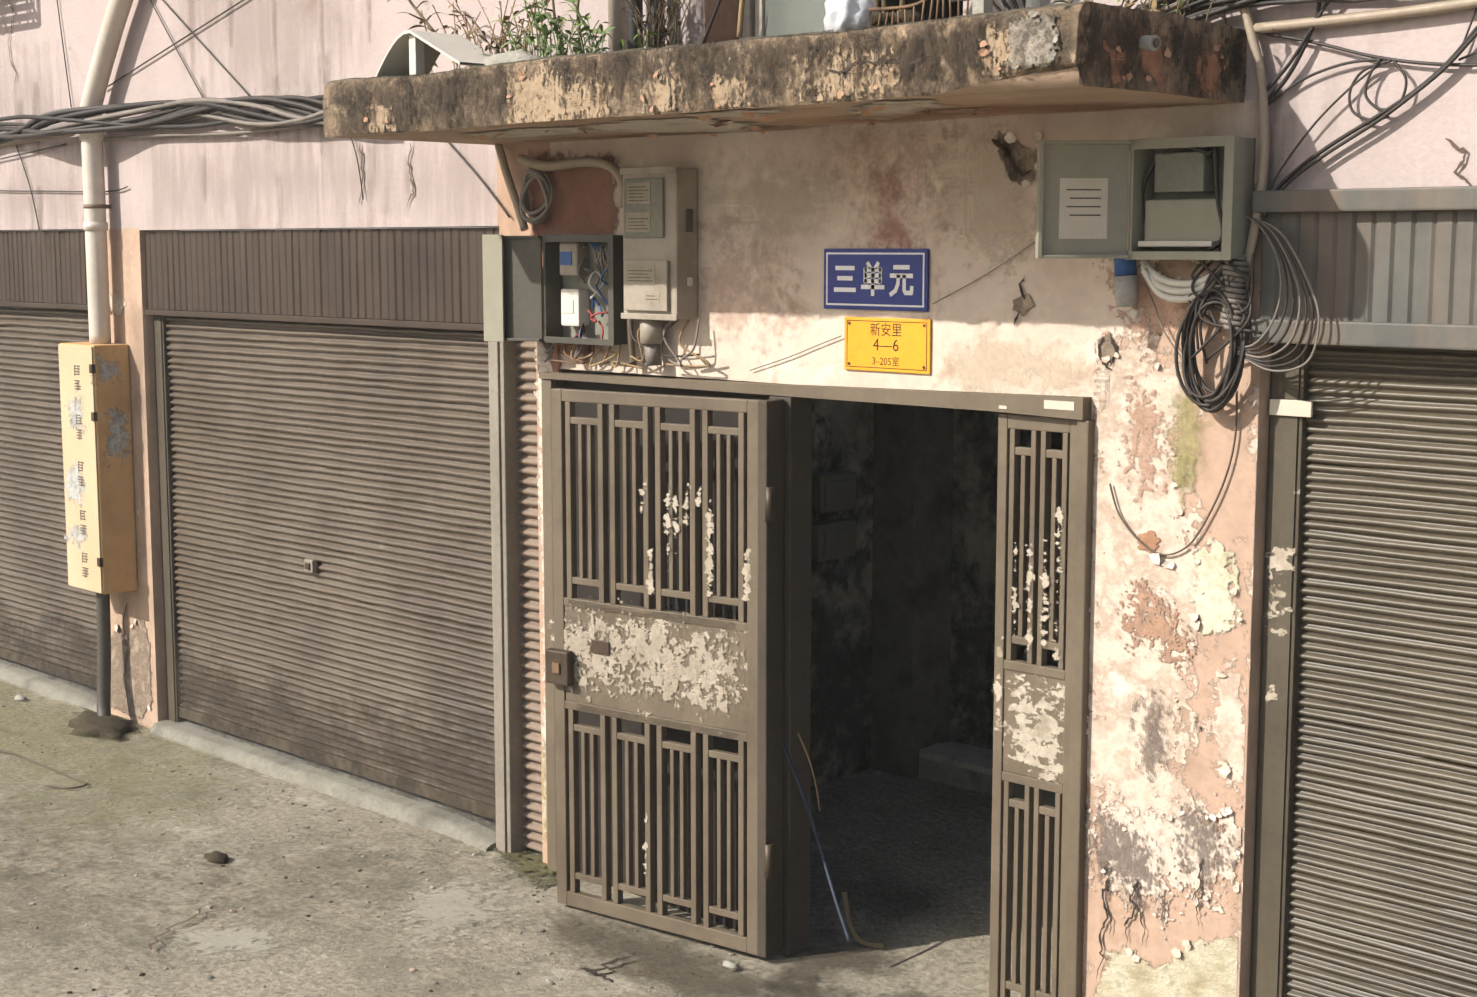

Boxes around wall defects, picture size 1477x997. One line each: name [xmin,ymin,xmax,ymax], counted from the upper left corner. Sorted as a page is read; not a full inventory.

damp [544,14,997,112]
damp [1077,1,1246,97]
spalling [1013,277,1035,325]
peeling [955,339,1071,392]
spalling [111,618,153,719]
peeling [1084,259,1246,997]
crack [1096,858,1204,979]